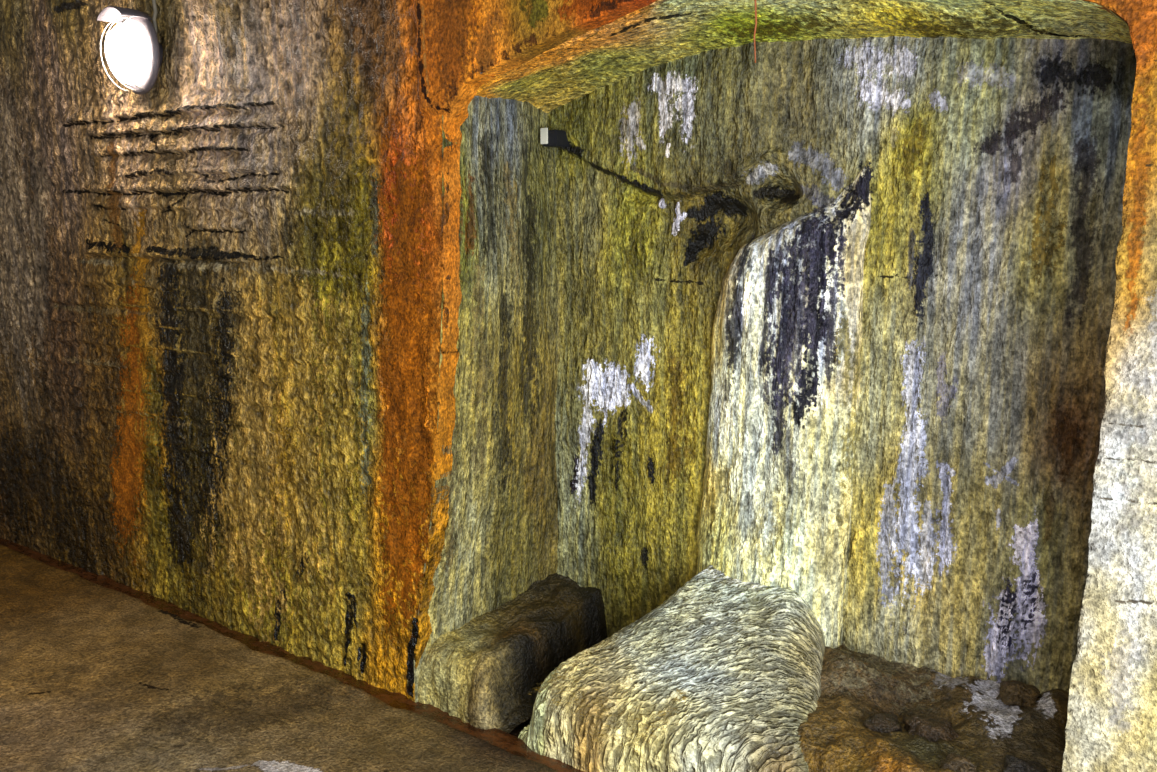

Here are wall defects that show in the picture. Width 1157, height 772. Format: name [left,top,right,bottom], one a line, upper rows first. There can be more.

corrosion [105,141,155,565]
crack [62,101,289,262]
leakage [0,83,376,644]
corrosion [375,108,476,638]
corrosion [430,0,505,102]
leakage [570,334,694,505]
leakage [622,198,687,304]
leakage [619,72,699,168]
leakage [720,6,1046,607]
corrosion [1123,75,1154,332]
leakage [641,546,649,569]
leakage [962,508,1057,739]